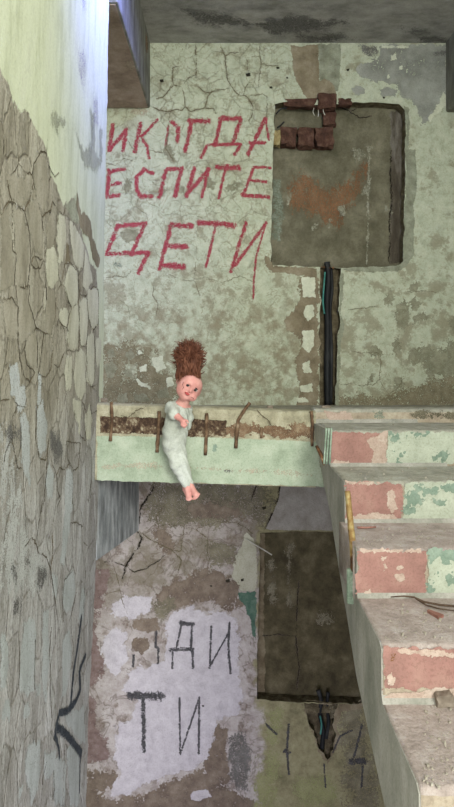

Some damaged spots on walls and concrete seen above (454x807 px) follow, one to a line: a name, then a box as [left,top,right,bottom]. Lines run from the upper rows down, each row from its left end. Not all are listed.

crack [109,43,278,166]
peeling [279,43,446,405]
peeling [264,256,322,405]
crack [1,151,127,718]
peeling [0,69,257,807]
crack [104,485,281,612]
peeling [346,489,398,519]
peeling [367,430,388,463]
flaking render [309,702,363,764]